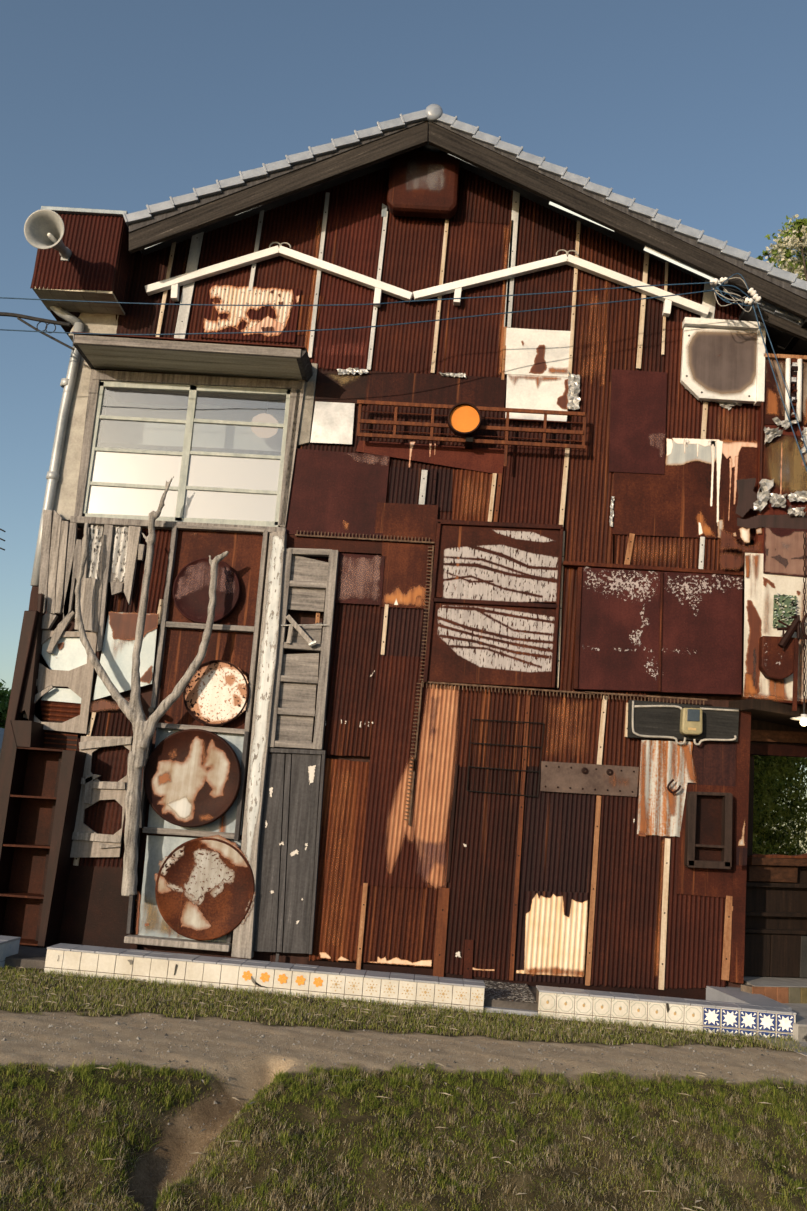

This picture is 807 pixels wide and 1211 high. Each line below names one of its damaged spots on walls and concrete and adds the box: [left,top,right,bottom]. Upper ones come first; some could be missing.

peeling [203,285,299,337]
corrosion [499,227,569,410]
corrosion [696,415,775,588]
corrosion [769,439,807,494]
peeling [437,530,558,673]
peeling [185,662,249,724]
corrosion [744,600,807,702]
peeling [151,736,230,822]
corrosion [639,743,648,837]
corrosion [663,744,695,815]
peeling [155,835,248,931]
peeling [473,894,588,1016]